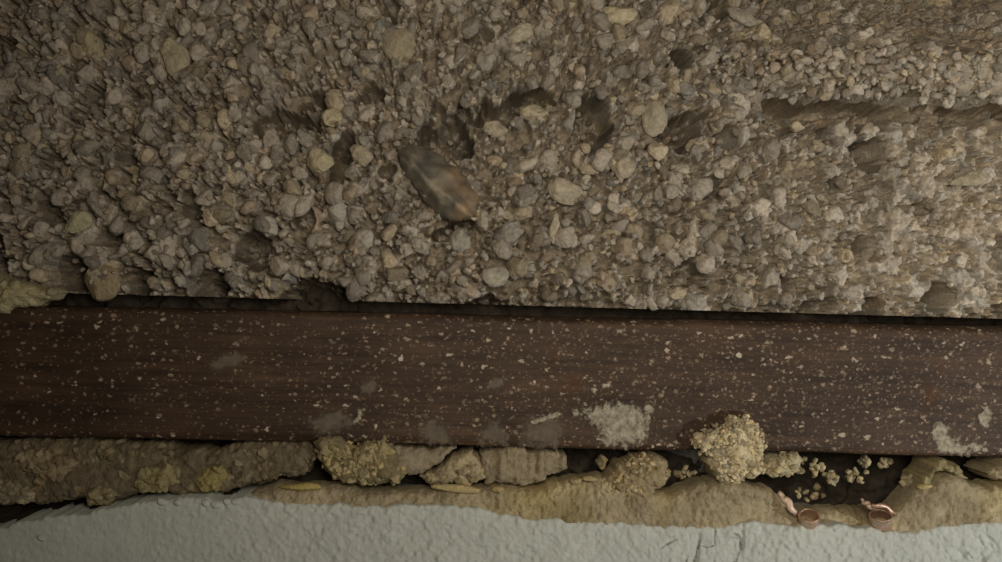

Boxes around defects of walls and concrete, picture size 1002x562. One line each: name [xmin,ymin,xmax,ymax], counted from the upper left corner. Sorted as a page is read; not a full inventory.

damp [523,401,656,449]
peeling [251,471,1002,533]